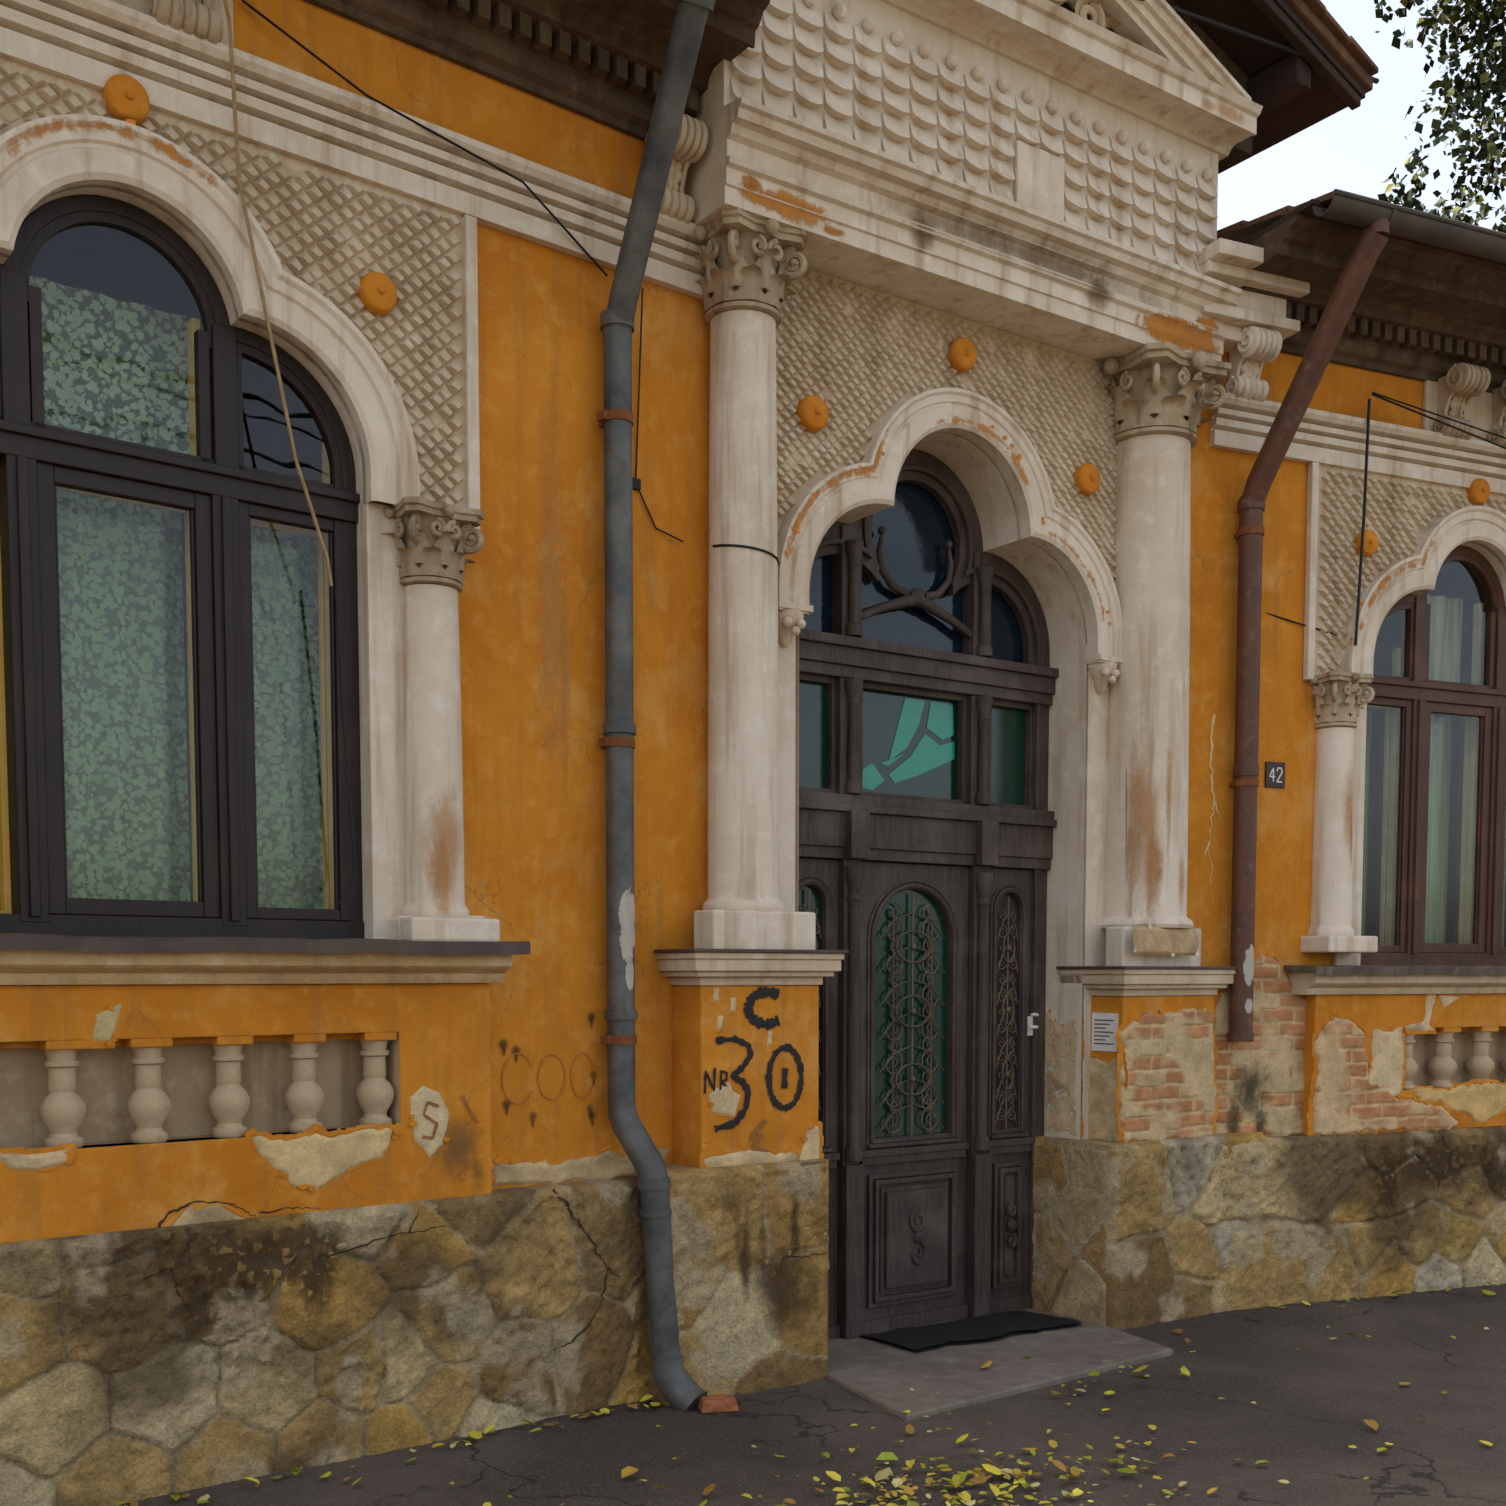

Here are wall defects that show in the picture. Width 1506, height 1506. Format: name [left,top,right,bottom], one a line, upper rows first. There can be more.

flaking render [0,1143,77,1174]
flaking render [245,1086,452,1194]
flaking render [706,1082,743,1120]
flaking render [1044,953,1506,1143]
crack [143,1201,320,1312]